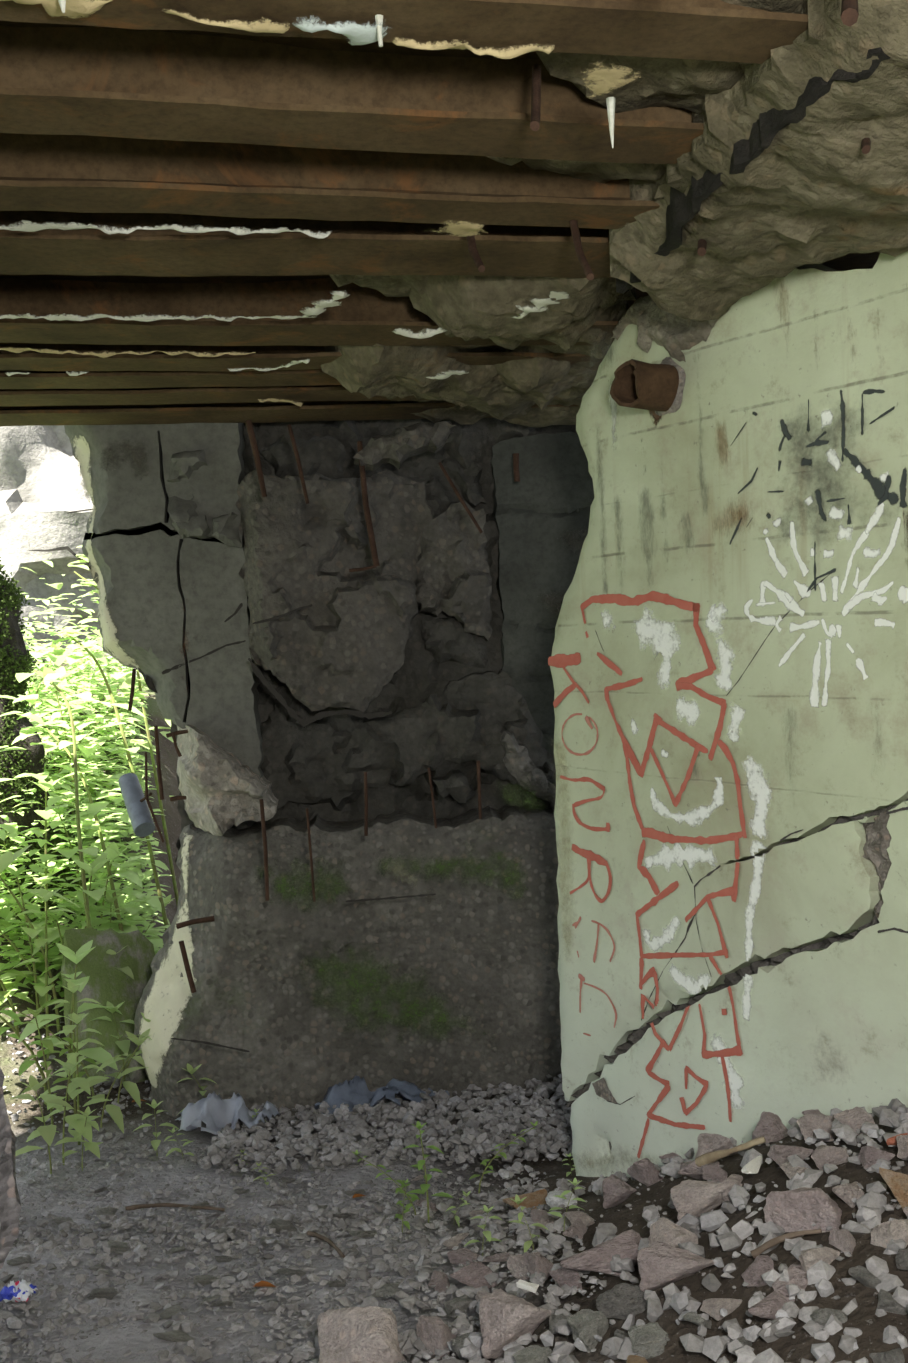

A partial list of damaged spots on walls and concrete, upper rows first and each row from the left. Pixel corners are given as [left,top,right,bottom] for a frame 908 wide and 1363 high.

damp [0,0,113,19]
damp [164,9,555,59]
spalling [721,0,802,13]
spalling [536,52,753,114]
spalling [486,156,667,184]
crack [616,47,890,294]
damp [0,221,331,239]
damp [0,291,349,322]
spalling [329,274,430,297]
spalling [373,278,730,428]
crack [28,447,392,728]
crack [566,799,908,1107]